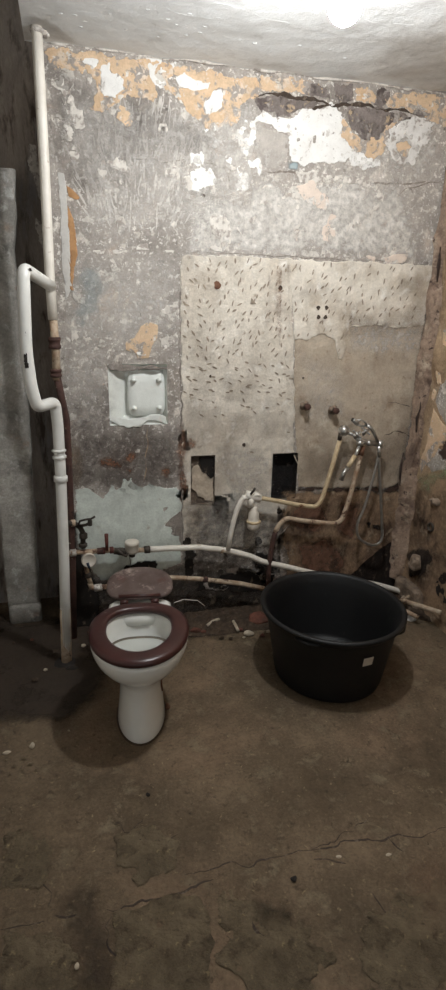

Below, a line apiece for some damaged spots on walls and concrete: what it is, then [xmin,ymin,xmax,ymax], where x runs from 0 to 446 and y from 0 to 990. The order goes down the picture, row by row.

peeling [44,47,446,244]
crack [258,91,427,116]
peeling [58,172,80,298]
peeling [125,322,158,359]
peeling [420,371,446,472]
peeling [75,455,215,581]
spalling [436,572,446,603]
crack [105,819,446,957]